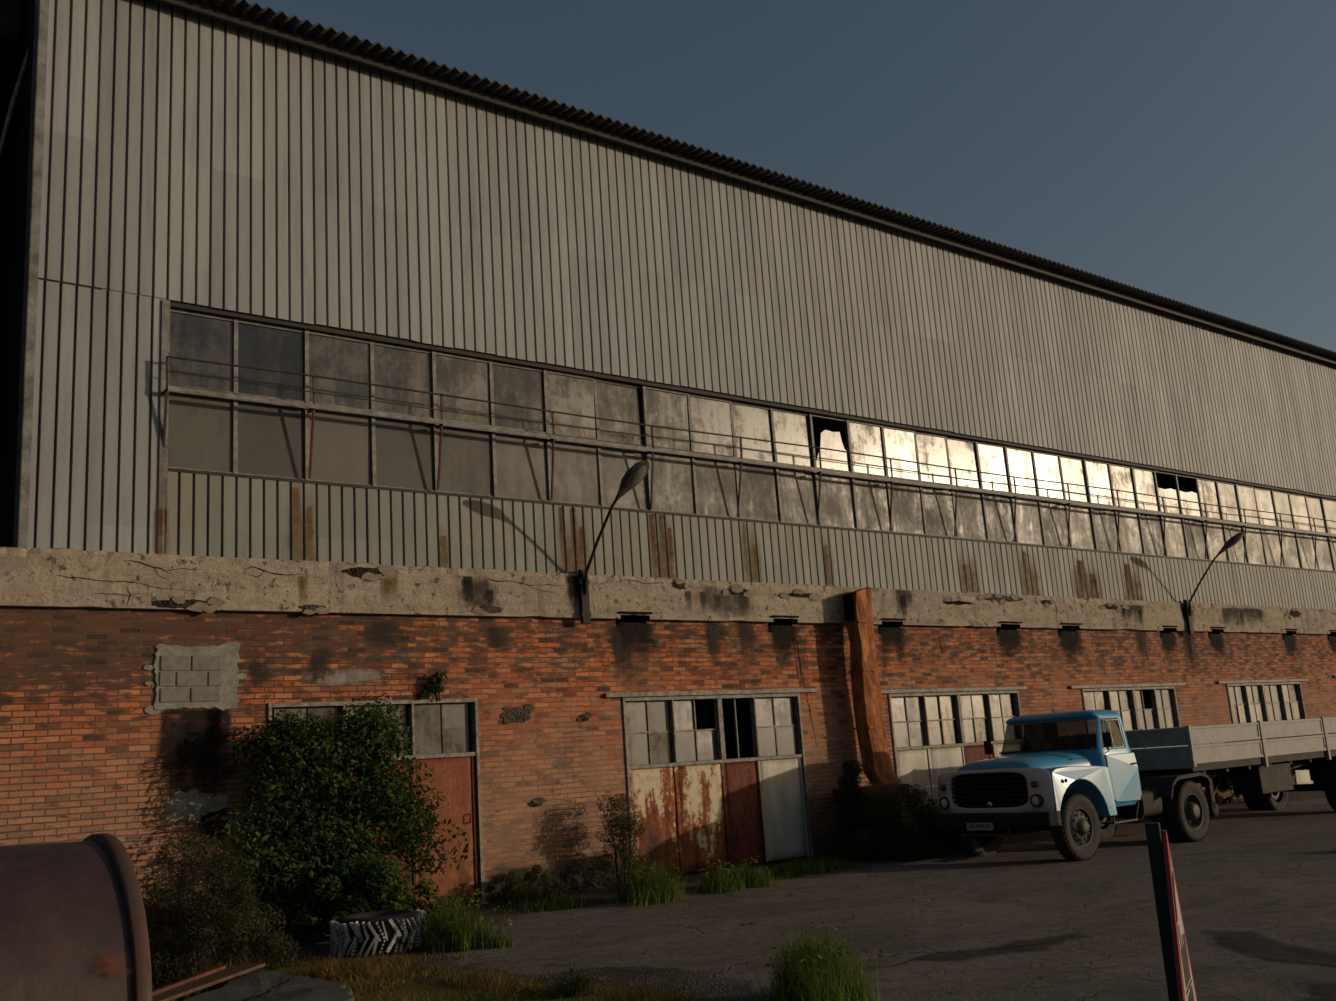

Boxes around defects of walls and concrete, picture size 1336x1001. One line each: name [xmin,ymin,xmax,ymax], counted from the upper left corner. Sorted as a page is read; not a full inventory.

rust [560,507,585,573]
crack [58,560,204,605]
crack [245,566,306,577]
leakage [463,576,493,606]
rust [1077,560,1100,599]
spalling [500,704,535,724]
leakage [161,709,231,764]